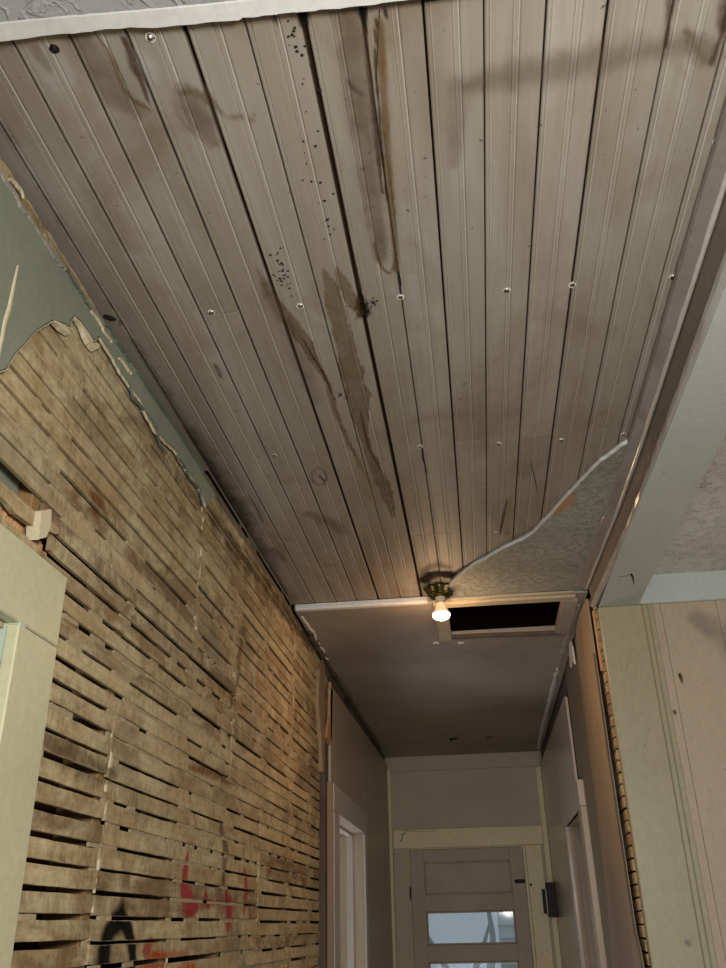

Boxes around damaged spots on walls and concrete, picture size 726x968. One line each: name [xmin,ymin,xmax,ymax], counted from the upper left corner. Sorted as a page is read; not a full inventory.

water stain [298,12,308,25]
water stain [359,6,399,273]
flaking render [0,175,215,507]
water stain [284,308,393,512]
water stain [336,265,373,351]